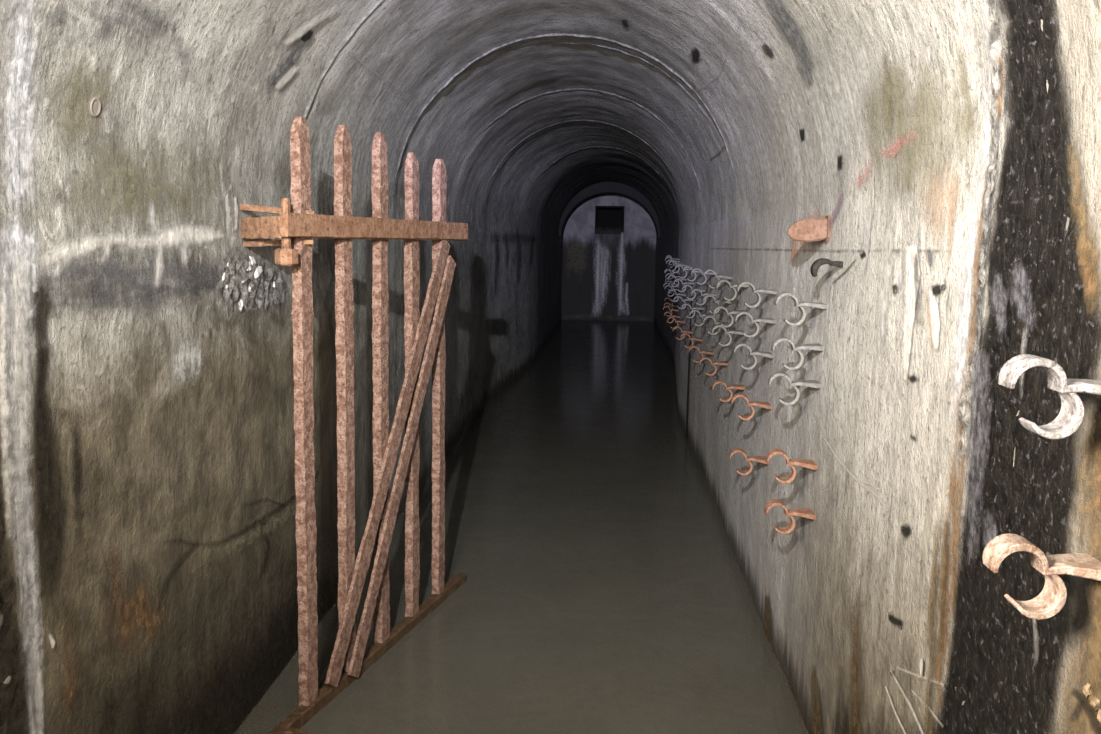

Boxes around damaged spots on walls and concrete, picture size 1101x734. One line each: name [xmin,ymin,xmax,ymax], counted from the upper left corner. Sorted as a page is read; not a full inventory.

water stain [4,0,37,205]
water stain [737,41,941,216]
spalling [217,252,286,312]
water stain [878,221,931,348]
water stain [935,0,1101,734]
water stain [0,158,238,734]
water stain [164,596,298,734]
crack [219,495,296,571]
water stain [317,575,332,622]
water stain [764,596,772,638]
water stain [798,603,871,734]
corrosion [925,404,964,734]